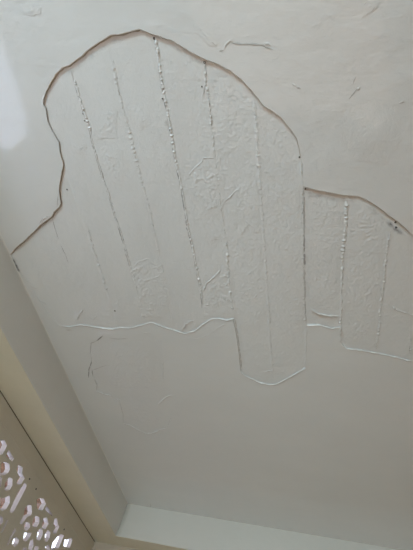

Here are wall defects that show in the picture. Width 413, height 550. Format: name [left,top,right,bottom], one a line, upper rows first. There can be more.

crack [71,71,137,295]
crack [112,57,160,254]
crack [153,36,204,305]
crack [201,60,242,367]
crack [220,40,273,51]